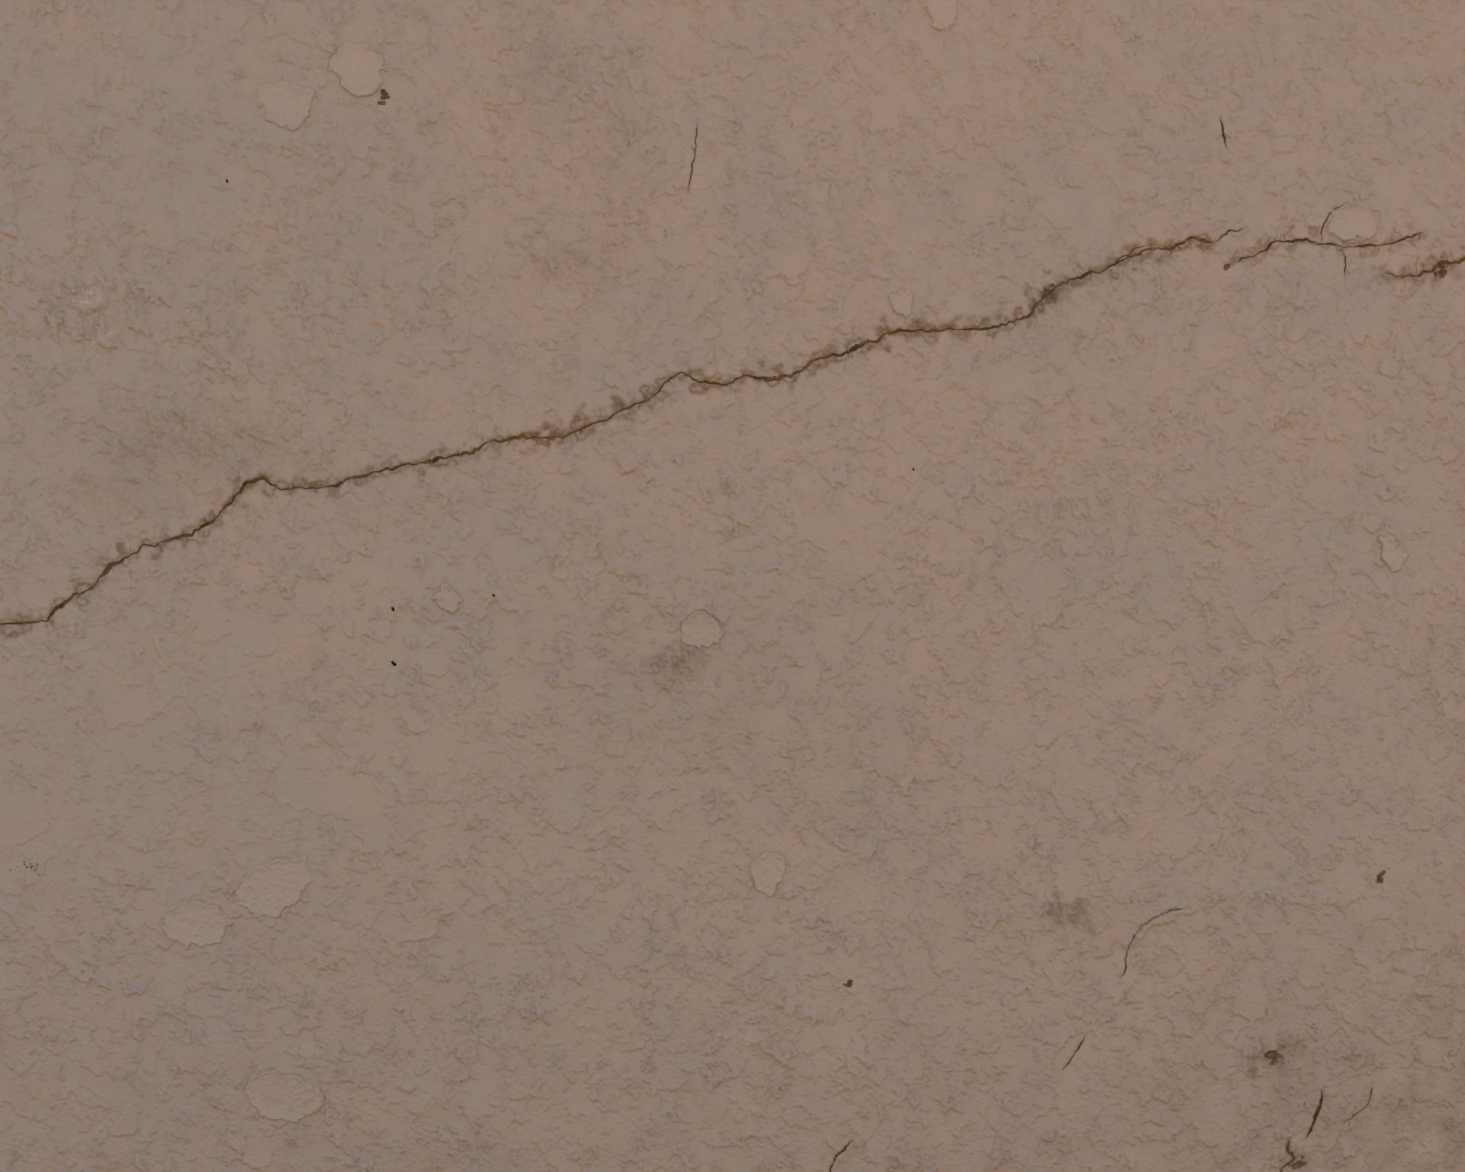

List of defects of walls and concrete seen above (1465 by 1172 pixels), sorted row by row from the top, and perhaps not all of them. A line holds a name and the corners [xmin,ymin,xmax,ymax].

crack [0,203,1465,635]